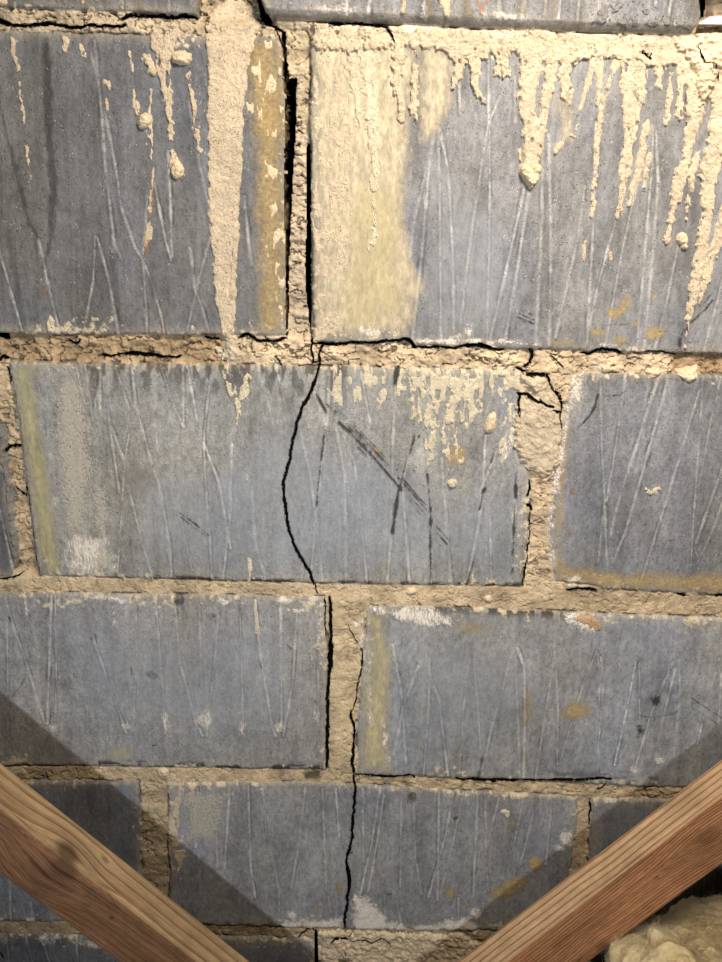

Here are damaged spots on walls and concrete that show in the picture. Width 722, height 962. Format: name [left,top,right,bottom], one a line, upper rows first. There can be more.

crack [0,12,197,29]
crack [582,347,677,355]
crack [205,0,564,962]
crack [567,585,597,593]
crack [455,777,612,825]